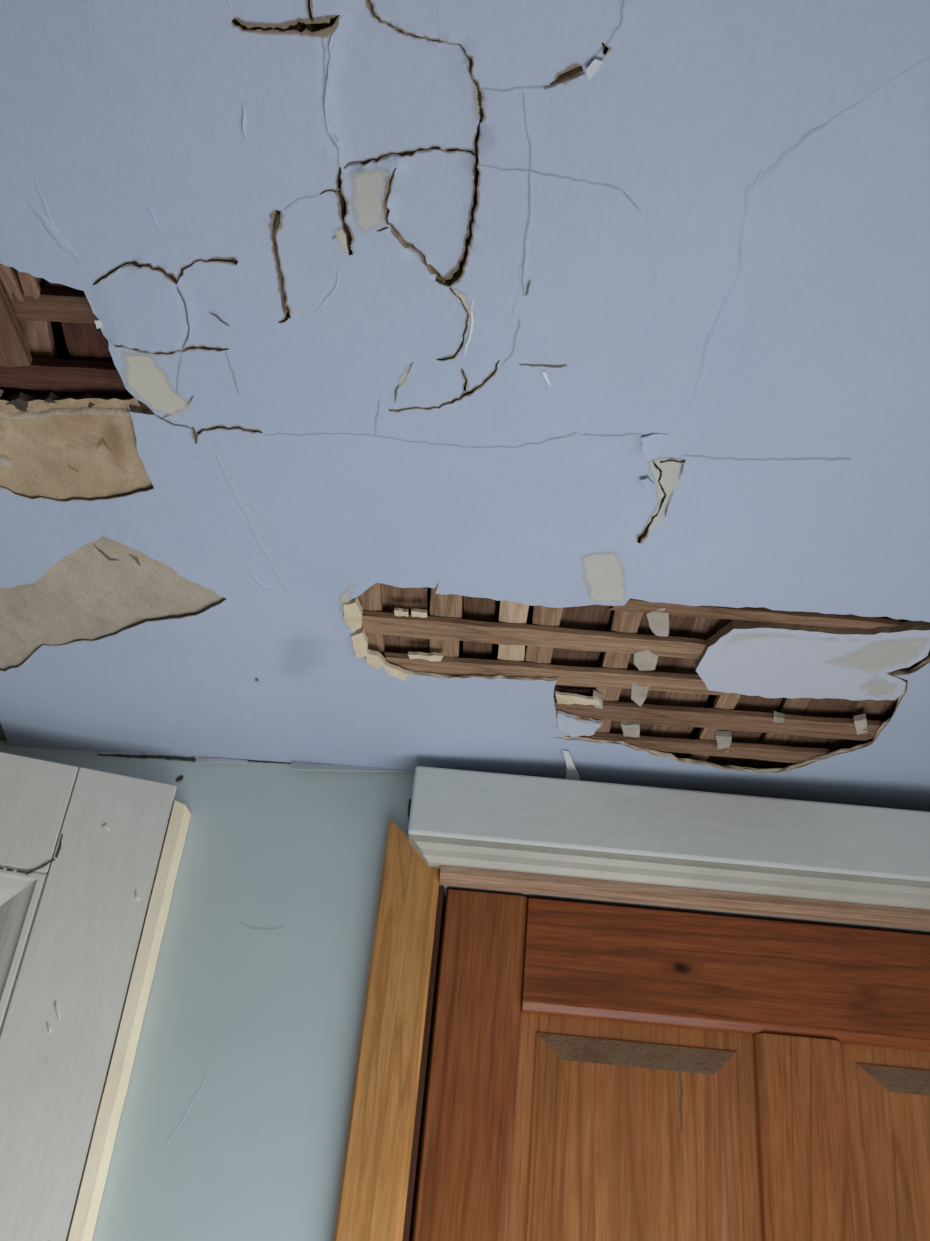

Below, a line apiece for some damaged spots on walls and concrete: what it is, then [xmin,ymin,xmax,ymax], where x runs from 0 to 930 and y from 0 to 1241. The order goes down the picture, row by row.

crack [544,42,611,89]
crack [232,0,566,412]
crack [94,257,237,355]
spalling [0,355,187,502]
crack [156,397,262,443]
spalling [0,536,226,672]
spalling [341,587,444,682]
flaking render [583,554,625,602]
peeling [695,620,930,701]
spalling [555,691,601,780]